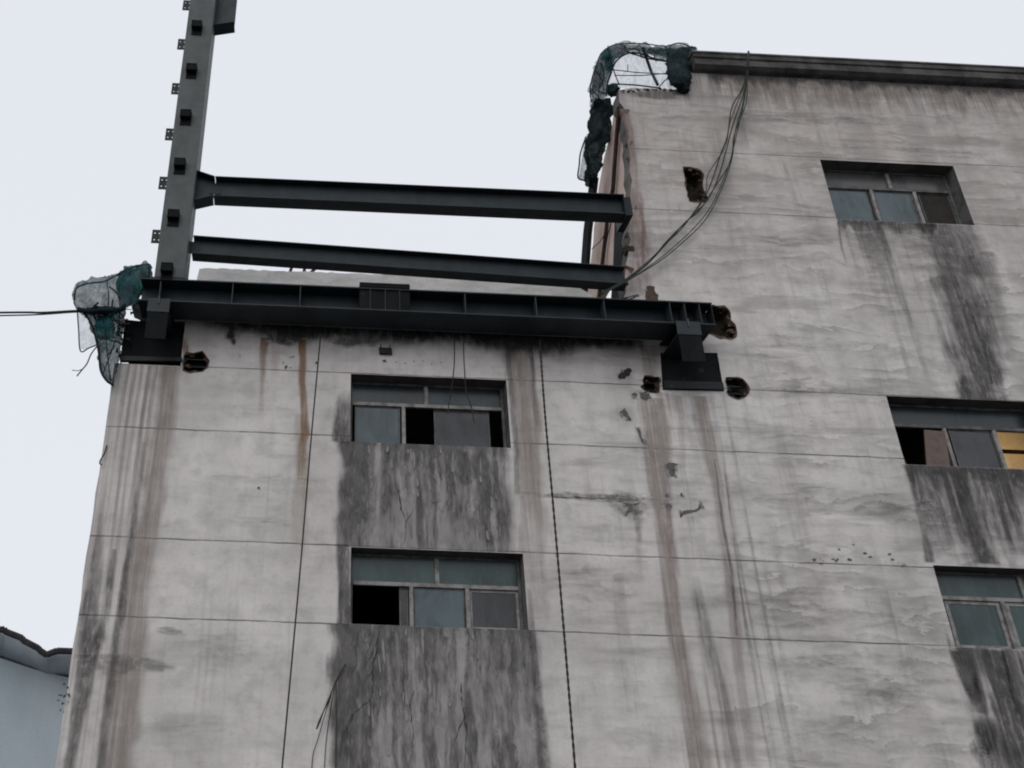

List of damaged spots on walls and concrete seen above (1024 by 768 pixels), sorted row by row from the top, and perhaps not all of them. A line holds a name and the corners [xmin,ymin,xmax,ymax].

spalling [683,166,708,202]
spalling [183,351,210,373]
rust [299,339,309,439]
water stain [214,322,642,504]
spalling [632,375,661,400]
spalling [708,305,737,339]
spalling [725,377,750,400]
water stain [838,219,1002,400]
water stain [906,465,1024,563]
water stain [331,405,549,768]
water stain [69,592,135,768]
water stain [952,647,1024,768]